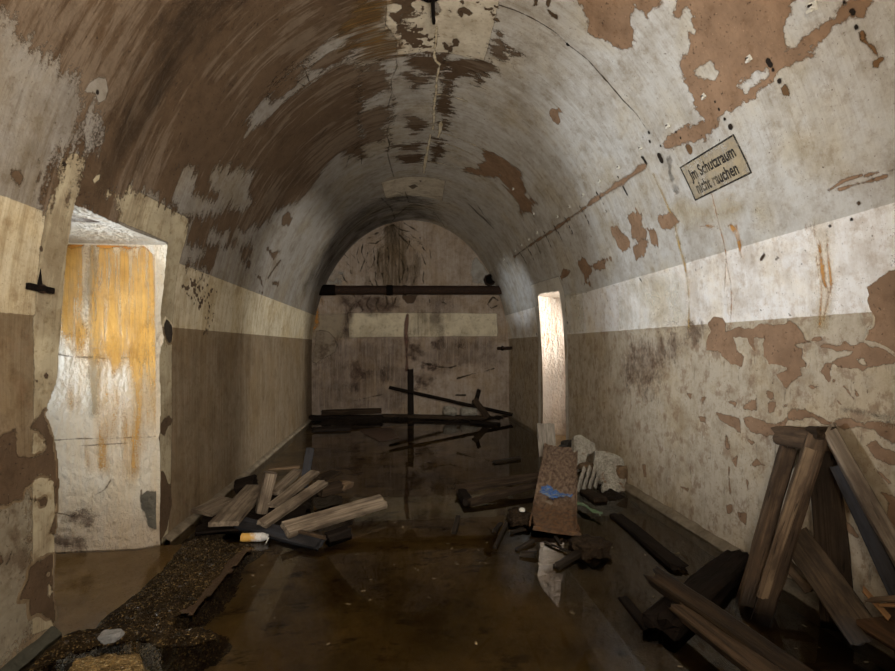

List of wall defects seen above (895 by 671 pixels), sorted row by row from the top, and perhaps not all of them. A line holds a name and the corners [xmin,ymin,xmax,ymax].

peeling [578,0,662,50]
peeling [0,0,526,274]
peeling [463,150,538,215]
peeling [549,107,562,124]
peeling [663,0,874,149]
crack [341,216,446,312]
peeling [560,256,612,287]
peeling [611,211,679,261]
corrosion [816,244,832,325]
corrosion [61,244,156,473]
flaking render [688,265,895,528]
peeling [0,408,60,667]